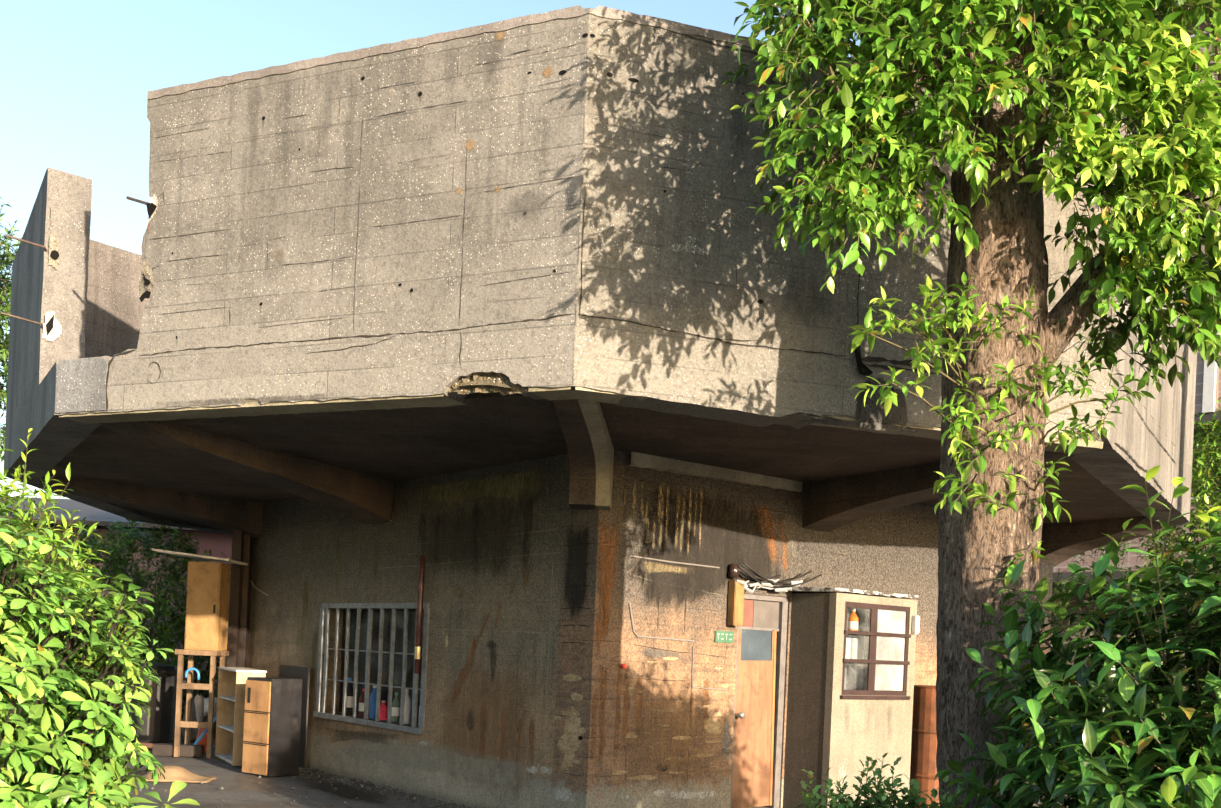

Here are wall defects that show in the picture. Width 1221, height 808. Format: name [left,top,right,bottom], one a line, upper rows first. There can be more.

spalling [126,192,164,233]
spalling [4,232,60,270]
crack [95,82,940,413]
spalling [138,258,163,302]
spalling [1,311,62,341]
spalling [448,373,529,395]
crack [780,412,849,422]
damp [623,482,703,573]
peeling [553,674,586,770]
corrosion [591,668,708,775]